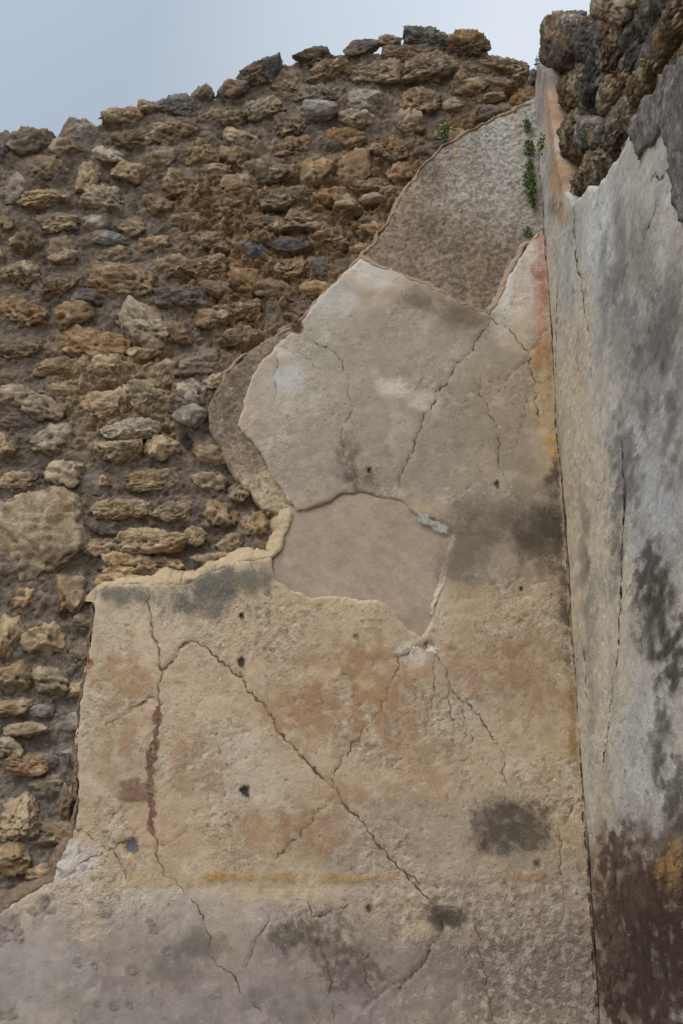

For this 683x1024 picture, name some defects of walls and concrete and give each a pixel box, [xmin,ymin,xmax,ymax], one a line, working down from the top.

flaking render [365,97,545,310]
peeling [208,330,298,515]
crack [274,331,353,479]
crack [62,828,126,879]
crack [105,590,507,1016]
flaking render [394,641,439,656]
flaking render [417,512,449,534]
water stain [438,460,569,624]
crack [398,152,626,1024]
water stain [633,538,683,894]